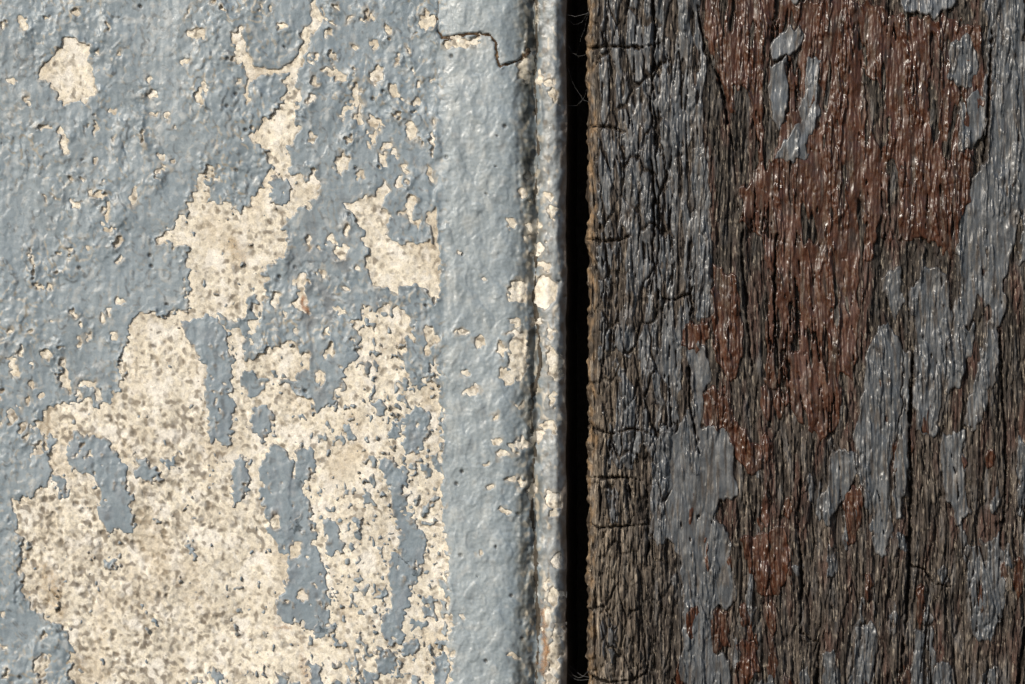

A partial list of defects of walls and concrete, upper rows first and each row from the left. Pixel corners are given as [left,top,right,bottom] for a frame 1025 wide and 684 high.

crack [435,0,541,205]
peeling [0,0,465,684]
spalling [454,329,485,349]
spalling [461,370,478,396]
crack [529,256,542,684]
peeling [595,0,1025,684]